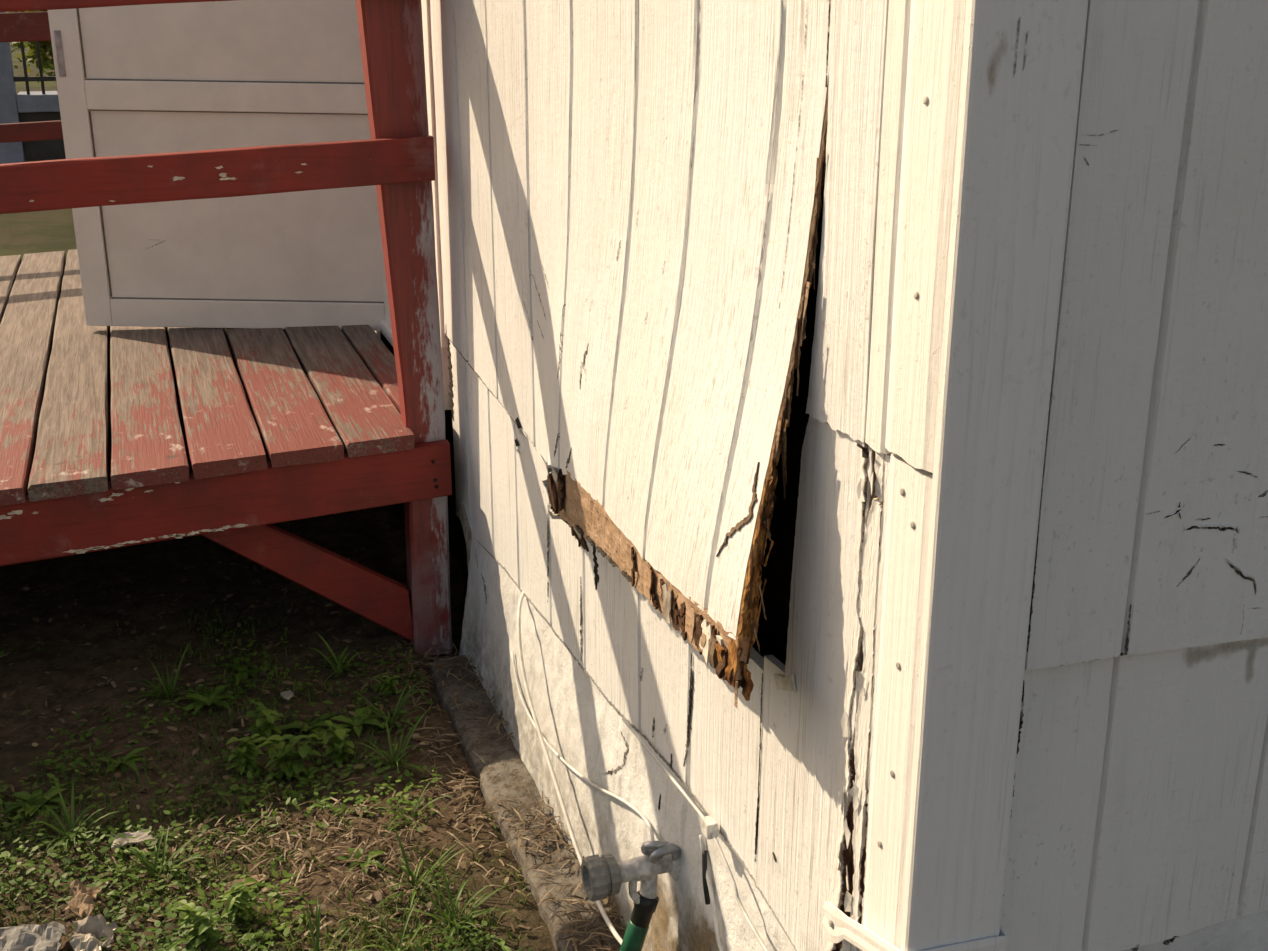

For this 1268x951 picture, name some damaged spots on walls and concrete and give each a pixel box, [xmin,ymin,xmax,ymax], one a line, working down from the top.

crack [1179,440,1267,497]
spalling [541,455,746,681]
crack [1150,500,1258,609]
water stain [645,883,719,951]